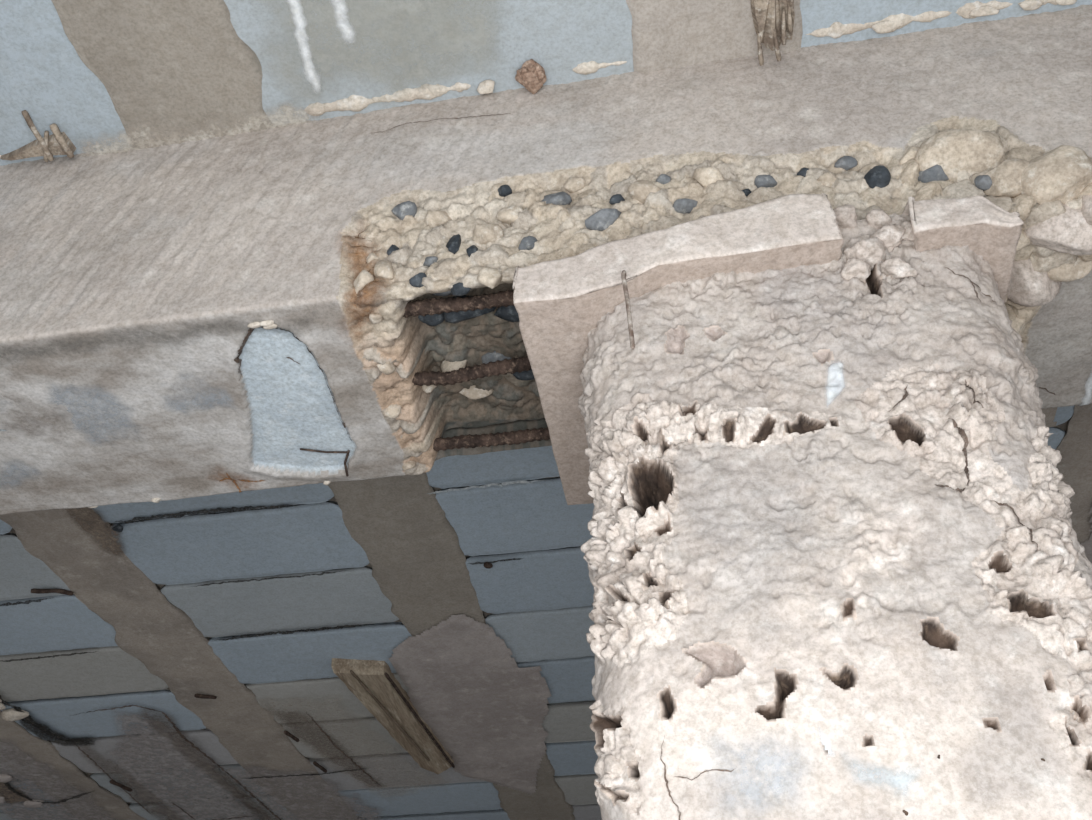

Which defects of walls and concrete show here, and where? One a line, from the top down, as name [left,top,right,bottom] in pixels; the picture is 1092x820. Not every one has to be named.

water stain [288,0,488,90]
corrosion [403,289,514,318]
spalling [336,115,1092,476]
peeling [234,320,357,486]
corrosion [412,356,532,386]
corrosion [433,427,550,452]
efflorescence [1079,374,1092,406]
crack [660,743,734,820]